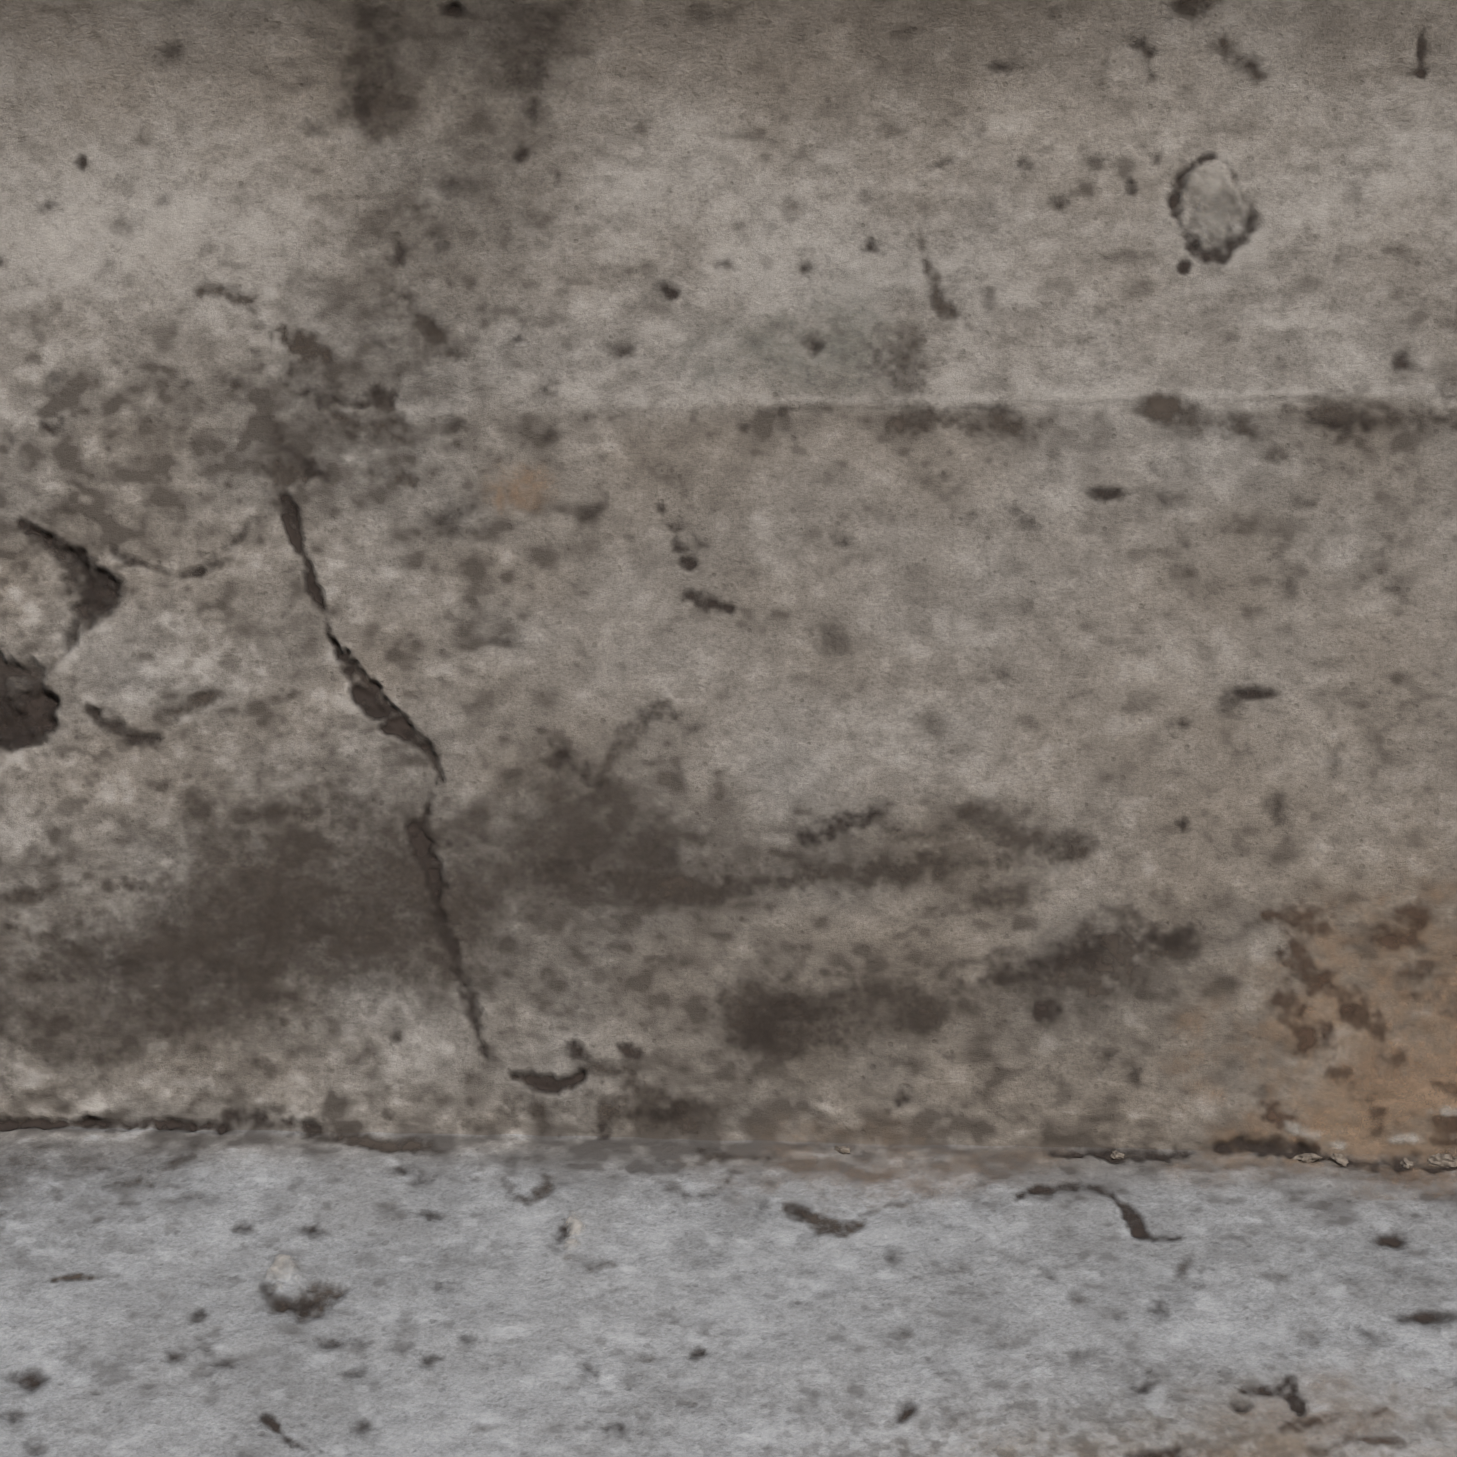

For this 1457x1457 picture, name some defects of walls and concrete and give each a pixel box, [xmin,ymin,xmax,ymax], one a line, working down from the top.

spalling [1168,155,1256,274]
crack [110,528,246,578]
spalling [0,653,59,749]
crack [280,494,487,1057]
damp [799,809,878,844]
damp [963,803,1090,867]
damp [982,909,1191,1022]
rust [1373,894,1437,950]
damp [716,983,848,1055]
rust [1228,908,1457,1179]
damp [598,1082,705,1139]
crack [1016,1137,1457,1241]